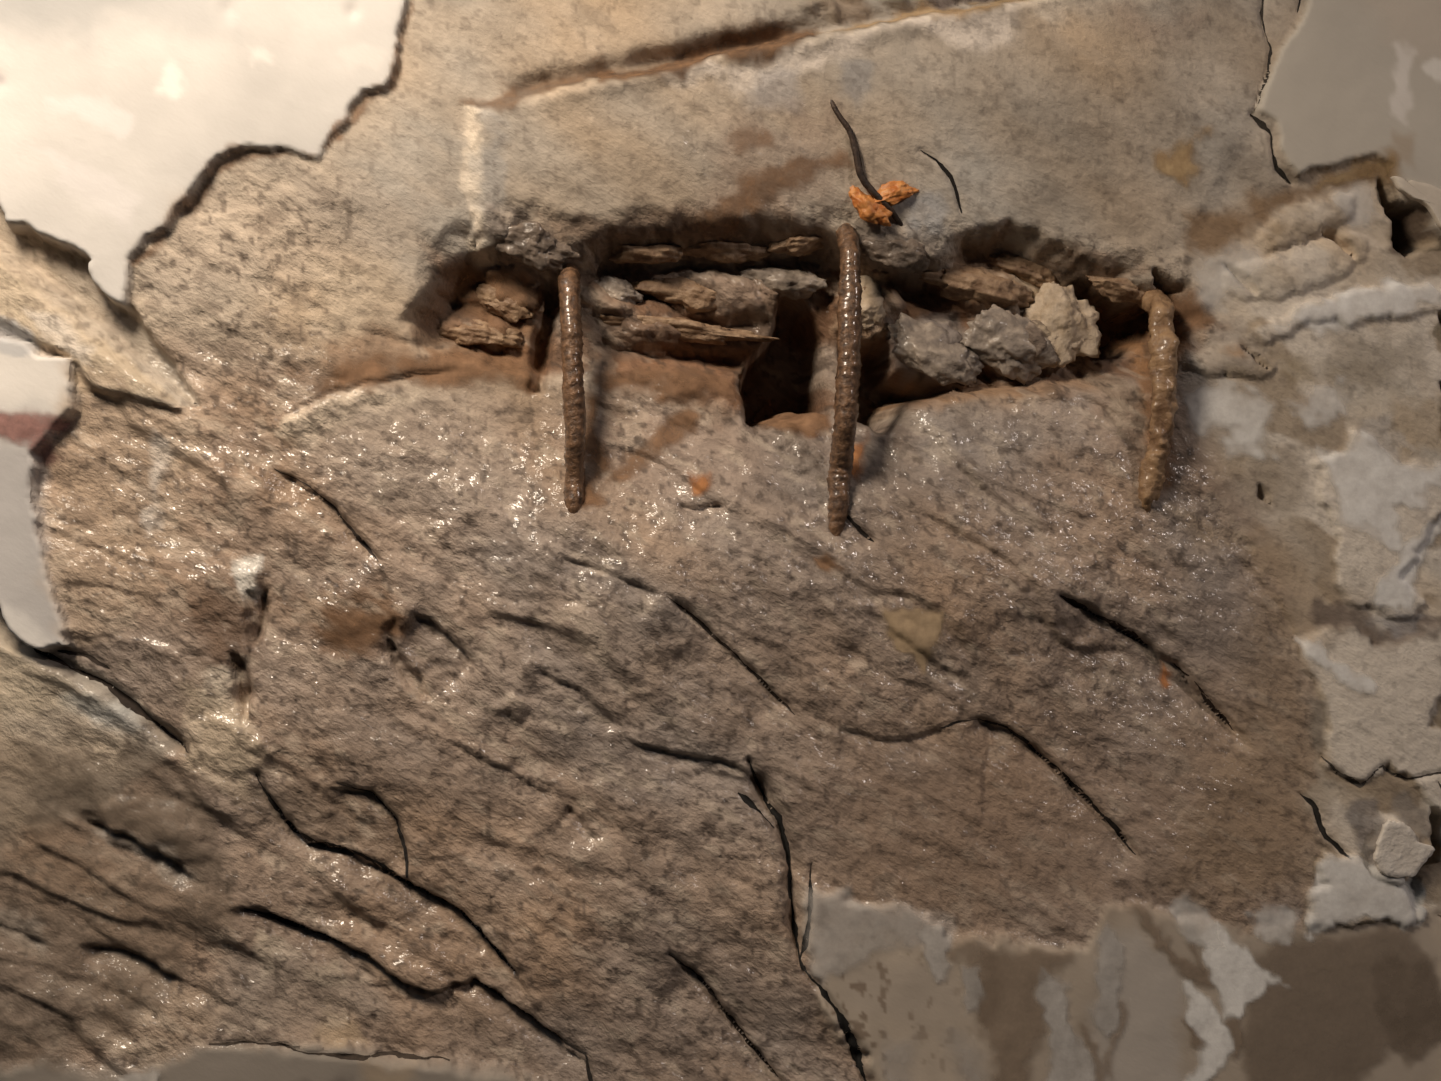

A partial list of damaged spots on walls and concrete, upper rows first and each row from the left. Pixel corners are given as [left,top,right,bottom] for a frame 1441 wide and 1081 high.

rust [848,181,919,227]
spalling [474,0,1323,320]
rust [1086,285,1151,358]
leakage [1293,278,1439,334]
rust [0,413,72,462]
peeling [1153,155,1441,919]
leakage [1318,432,1441,609]
spalling [0,608,182,845]
crack [33,648,189,753]
crack [209,774,593,1081]
crack [738,760,867,1081]
leakage [1134,856,1441,1081]